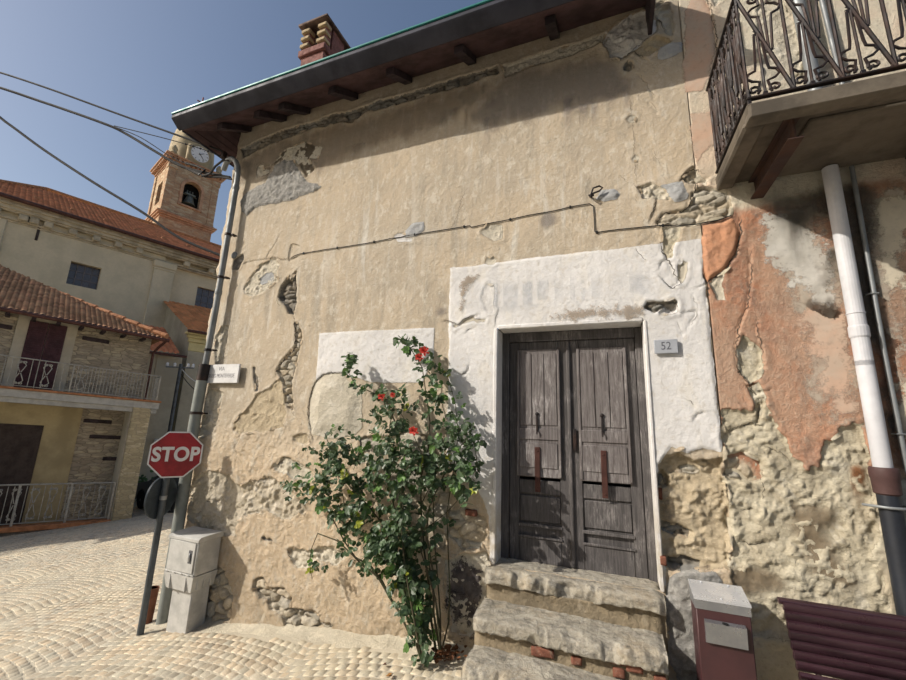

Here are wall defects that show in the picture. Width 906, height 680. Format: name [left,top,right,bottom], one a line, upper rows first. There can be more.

flaking render [240,0,674,177]
peeling [682,0,721,92]
peeling [233,258,302,435]
peeling [637,183,669,200]
flaking render [644,297,678,316]
crack [611,20,764,431]
flaking render [656,111,739,300]
peeling [657,212,890,642]
peeling [869,188,906,305]
peeling [886,316,906,439]
flaking render [250,577,333,628]
water stain [444,556,483,626]